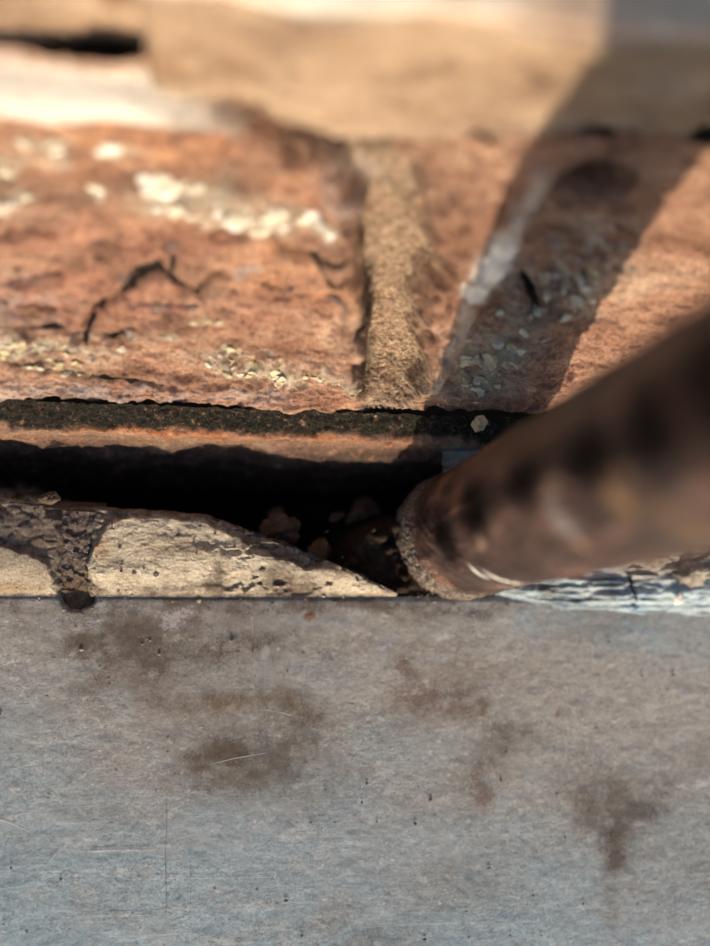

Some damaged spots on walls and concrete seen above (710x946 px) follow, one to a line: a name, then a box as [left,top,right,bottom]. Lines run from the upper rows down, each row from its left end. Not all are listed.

spalling [0,491,107,610]
efflorescence [154,605,194,631]